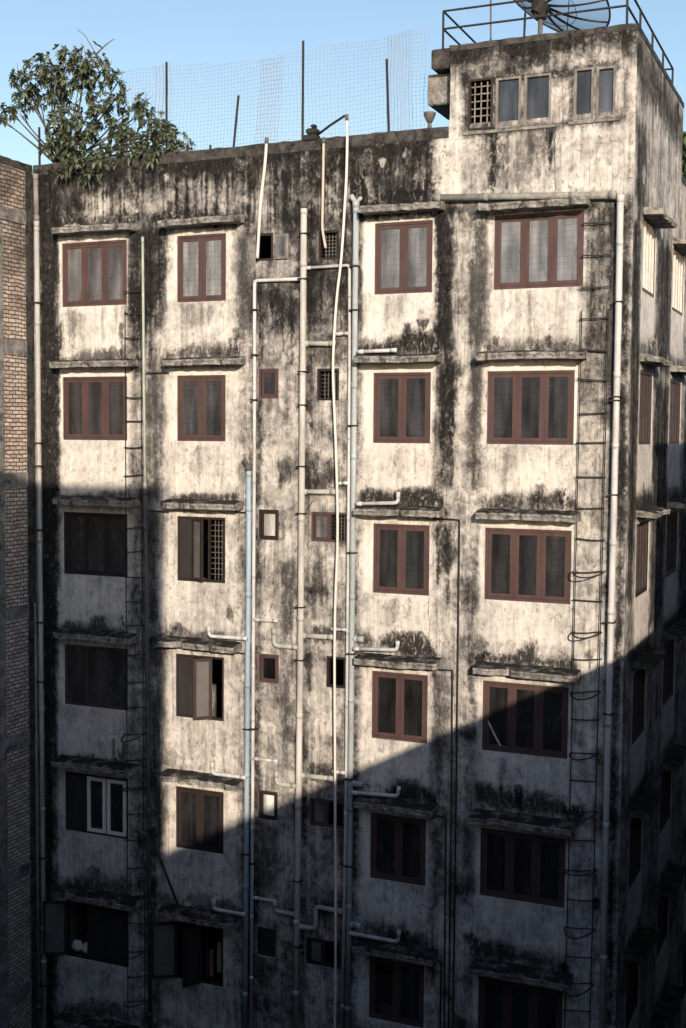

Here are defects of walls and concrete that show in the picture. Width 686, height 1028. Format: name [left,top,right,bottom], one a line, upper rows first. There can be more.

water stain [450,30,683,144]
water stain [545,128,555,164]
water stain [470,228,579,351]
water stain [32,129,502,901]
water stain [481,485,582,511]
water stain [558,120,686,1025]
water stain [460,637,592,669]
water stain [473,782,585,837]